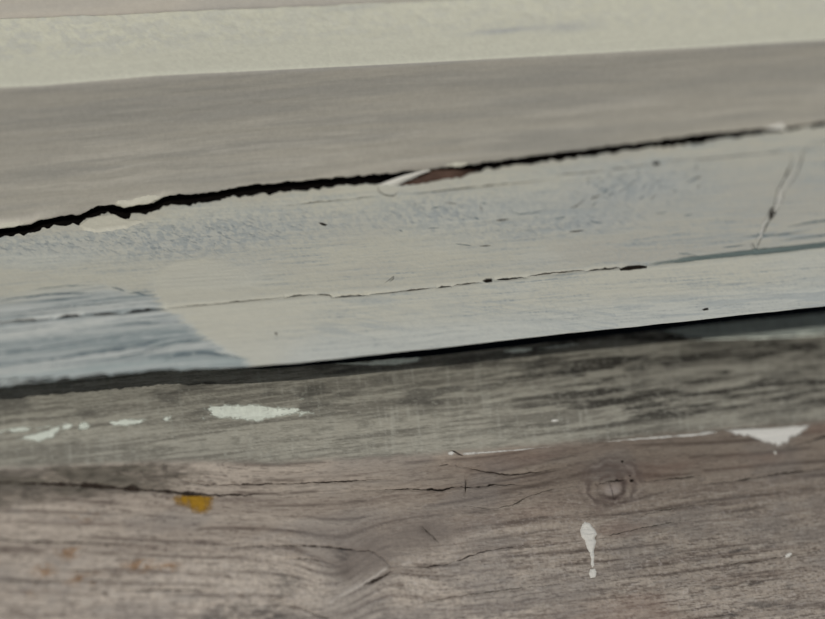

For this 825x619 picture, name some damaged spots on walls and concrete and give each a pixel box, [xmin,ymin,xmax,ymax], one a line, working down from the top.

crack [0,177,389,237]
crack [426,122,825,250]
crack [0,267,618,323]
peeling [0,322,200,364]
peeling [164,351,242,361]